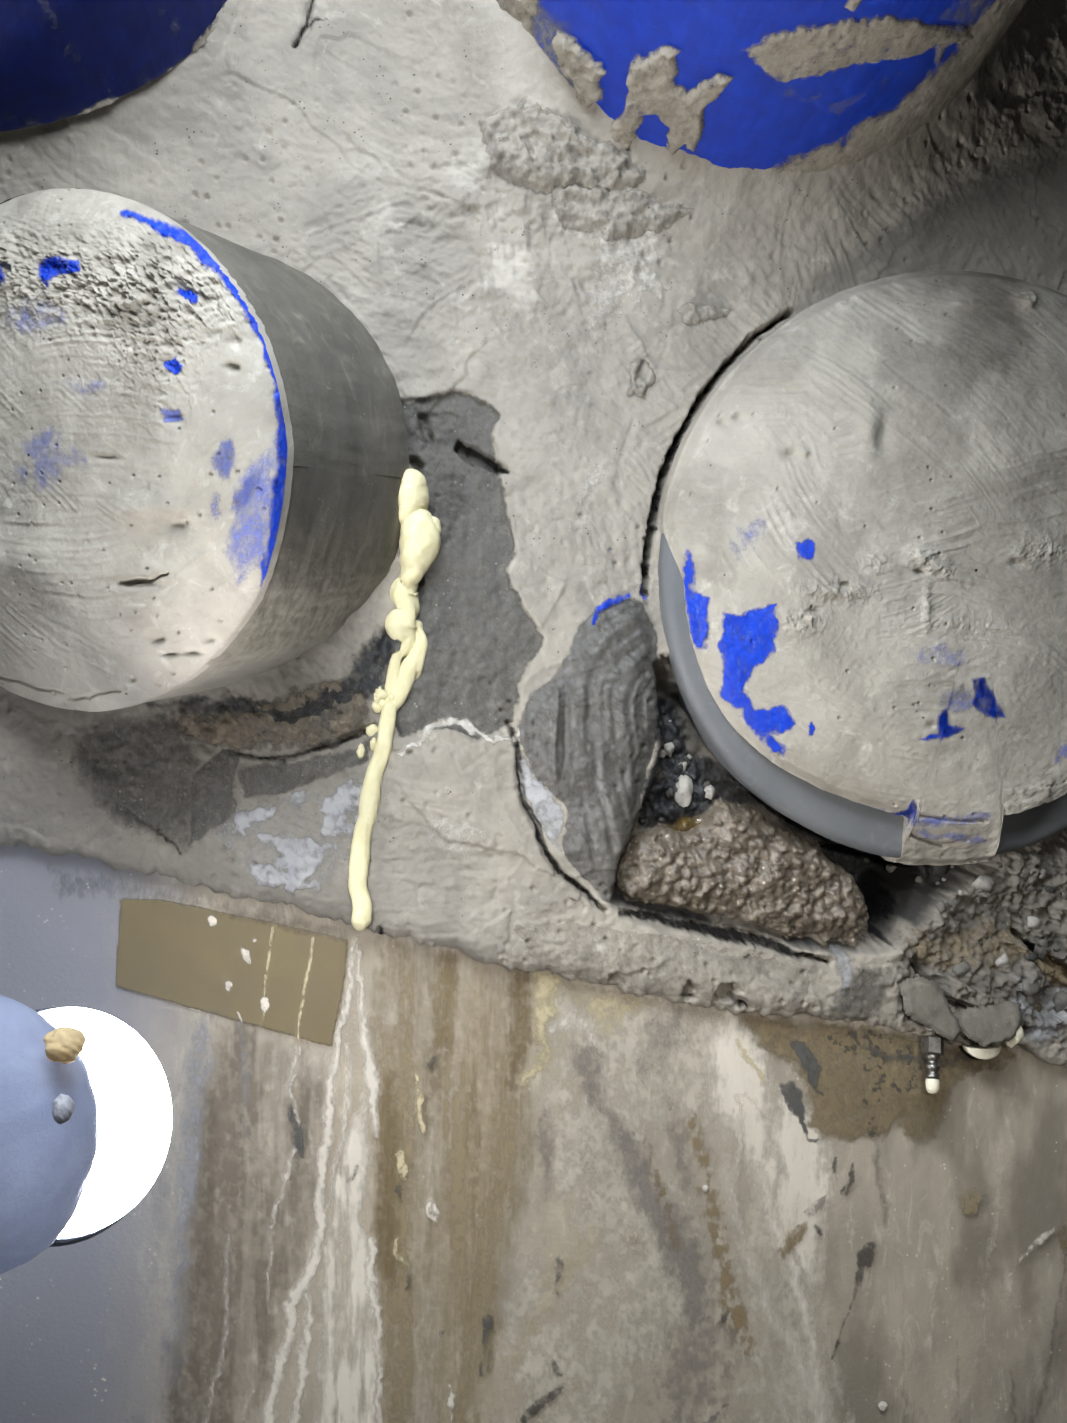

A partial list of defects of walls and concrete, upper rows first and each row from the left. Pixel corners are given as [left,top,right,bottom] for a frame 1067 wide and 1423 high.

crack [292,0,319,49]
crack [641,315,784,596]
spalling [77,627,400,893]
crack [241,730,366,763]
damp [168,392,1015,1423]
spalling [617,696,897,947]
spalling [915,862,1003,921]
peeling [953,916,1067,1047]